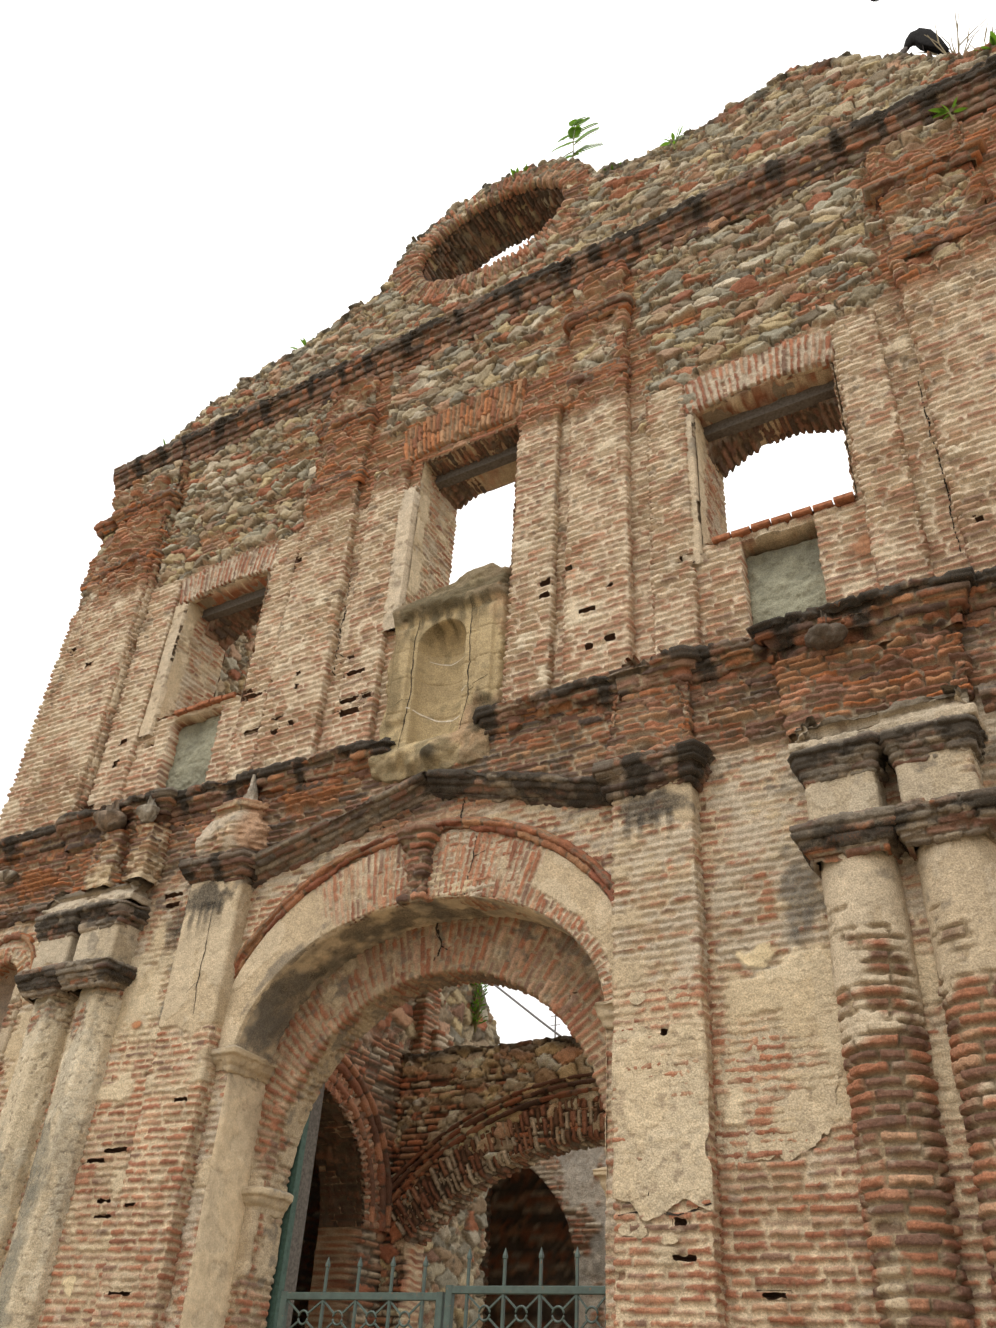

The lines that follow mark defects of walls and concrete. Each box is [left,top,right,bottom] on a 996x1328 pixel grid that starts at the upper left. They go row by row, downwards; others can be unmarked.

water stain [233,832,399,979]
water stain [433,816,615,902]
spalling [27,1009,41,1033]
water stain [244,945,325,1059]
peeling [667,989,690,1003]
peeling [611,1017,839,1262]